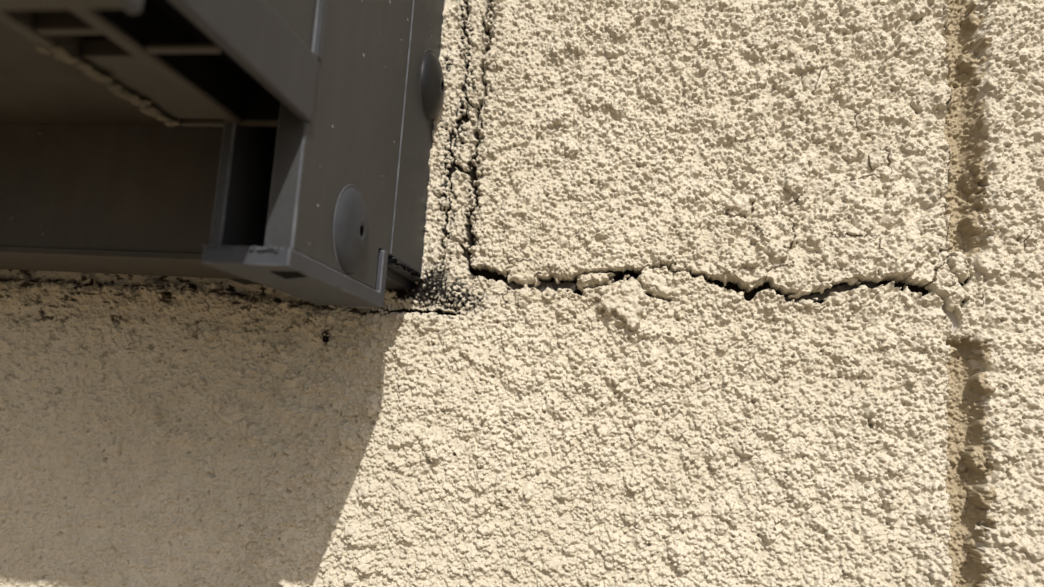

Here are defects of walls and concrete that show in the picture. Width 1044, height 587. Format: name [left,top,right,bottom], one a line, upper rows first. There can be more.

leakage [0,0,488,344]
crack [440,0,984,313]